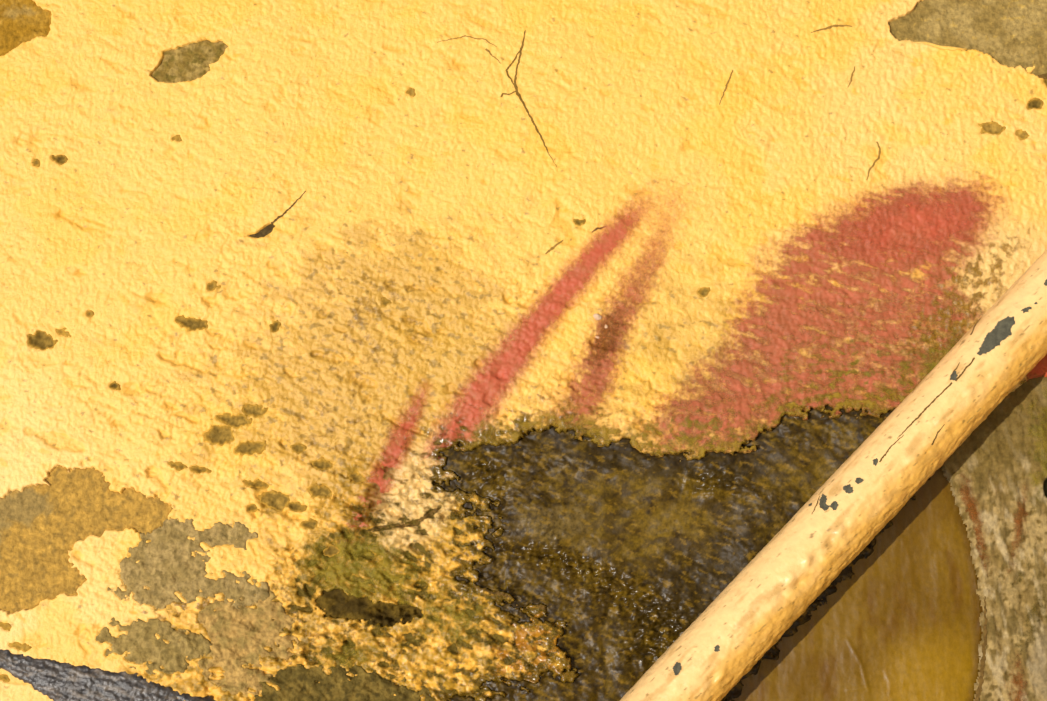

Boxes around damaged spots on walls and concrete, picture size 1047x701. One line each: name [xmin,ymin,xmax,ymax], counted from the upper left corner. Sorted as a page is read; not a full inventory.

peeling [0,0,52,56]
peeling [151,40,228,83]
crack [437,30,557,167]
peeling [888,0,1047,86]
spalling [1026,98,1044,110]
spalling [168,461,212,474]
spalling [204,404,268,456]
peeling [0,465,434,701]
water stain [411,374,914,701]
spalling [433,405,894,701]
water stain [724,468,983,701]
spalling [940,375,1047,701]